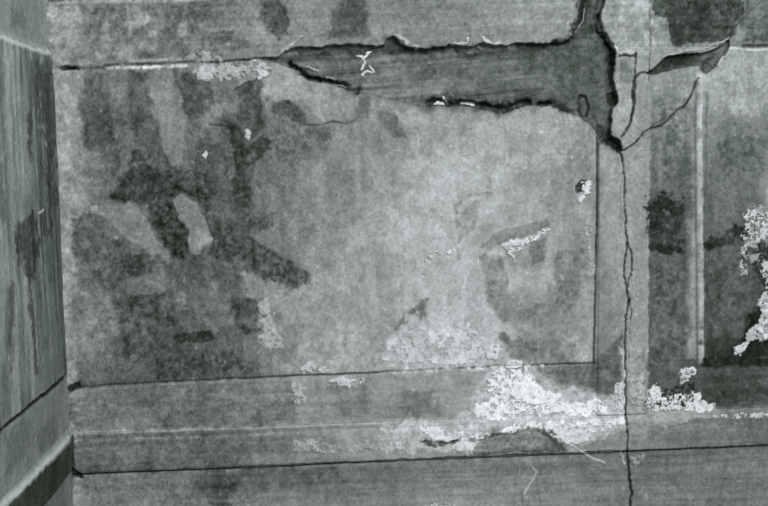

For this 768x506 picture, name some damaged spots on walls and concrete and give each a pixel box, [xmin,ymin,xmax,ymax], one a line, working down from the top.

water stain [667,0,739,47]
spalling [265,0,629,153]
spalling [647,39,735,74]
water stain [121,150,170,202]
water stain [643,191,684,255]
crack [619,53,700,506]
water stain [703,205,768,368]
water stain [256,297,284,350]
water stain [291,311,768,468]